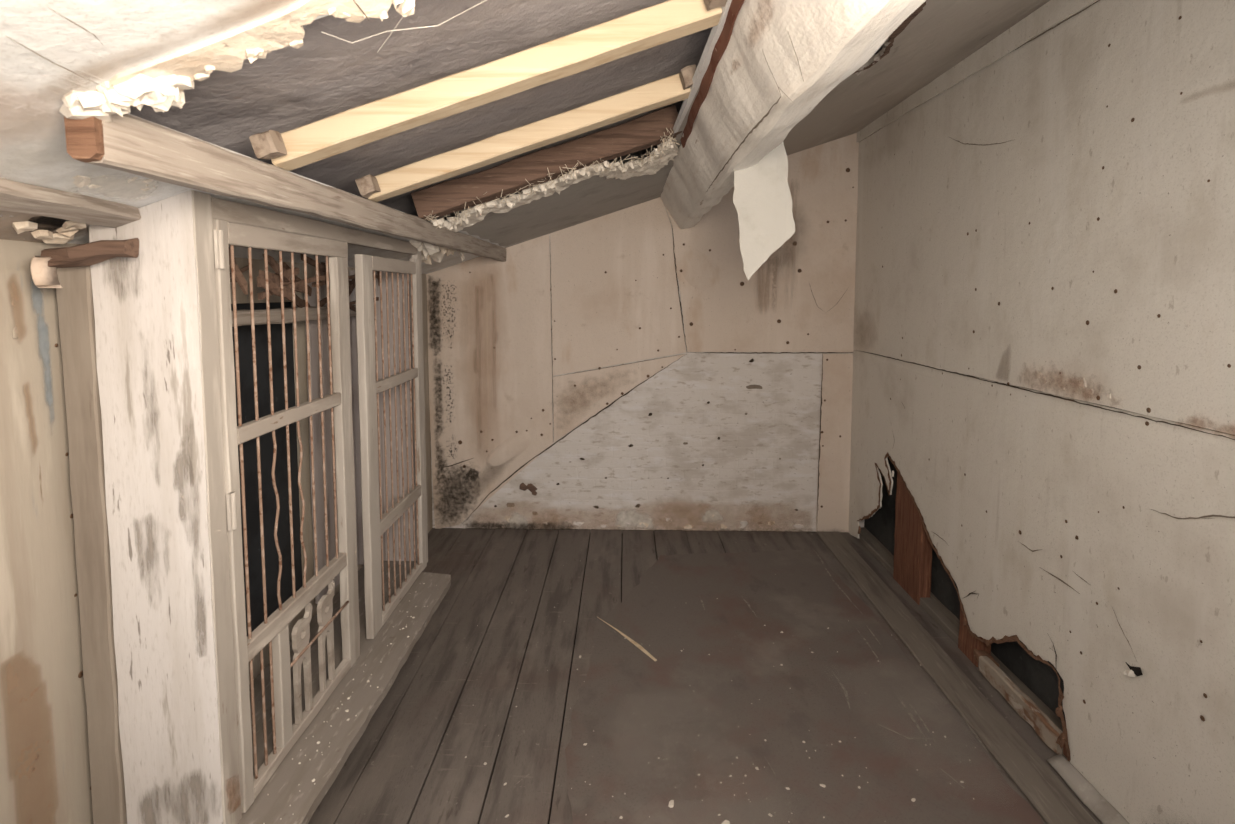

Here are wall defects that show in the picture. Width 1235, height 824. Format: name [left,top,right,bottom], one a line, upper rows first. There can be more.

spalling [59,0,415,124]
spalling [853,0,927,76]
crack [1010,0,1100,53]
spalling [424,128,680,232]
spalling [12,216,86,244]
spalling [409,240,465,265]
damp [428,279,456,350]
crack [462,229,1235,524]
damp [436,365,479,524]